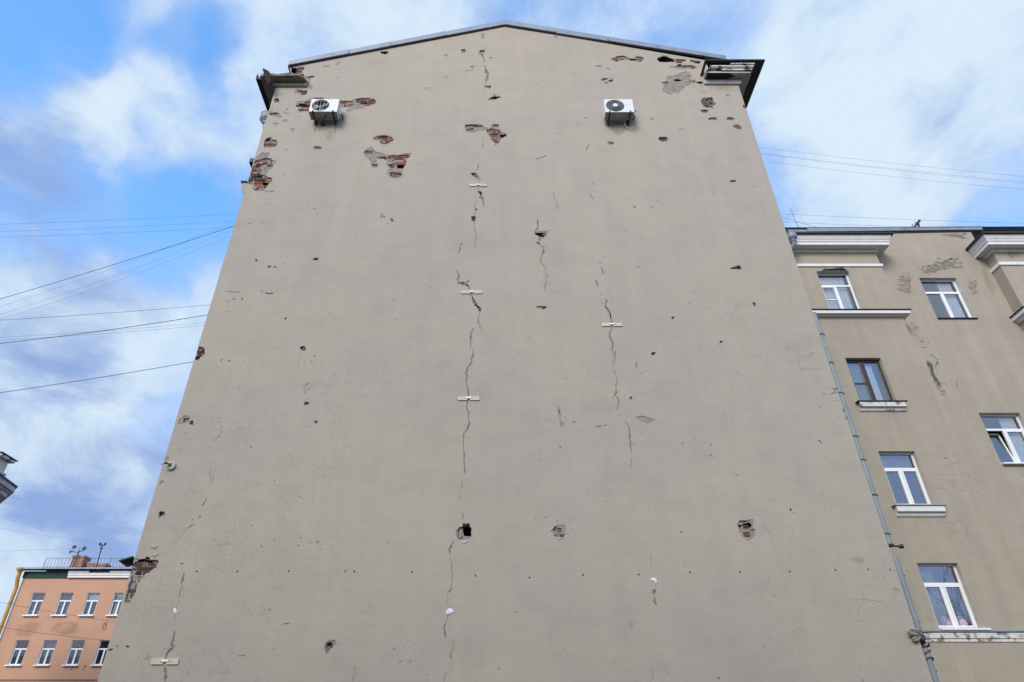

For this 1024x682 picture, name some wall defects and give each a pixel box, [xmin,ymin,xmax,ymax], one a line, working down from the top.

spalling [248,62,341,204]
spalling [364,135,411,178]
spalling [464,124,507,144]
crack [481,54,495,95]
flaking render [657,55,742,130]
crack [456,139,496,284]
crack [535,193,559,290]
crack [595,263,633,470]
spalling [124,557,159,604]
crack [163,573,185,682]
spalling [456,523,472,541]
crack [443,313,486,682]